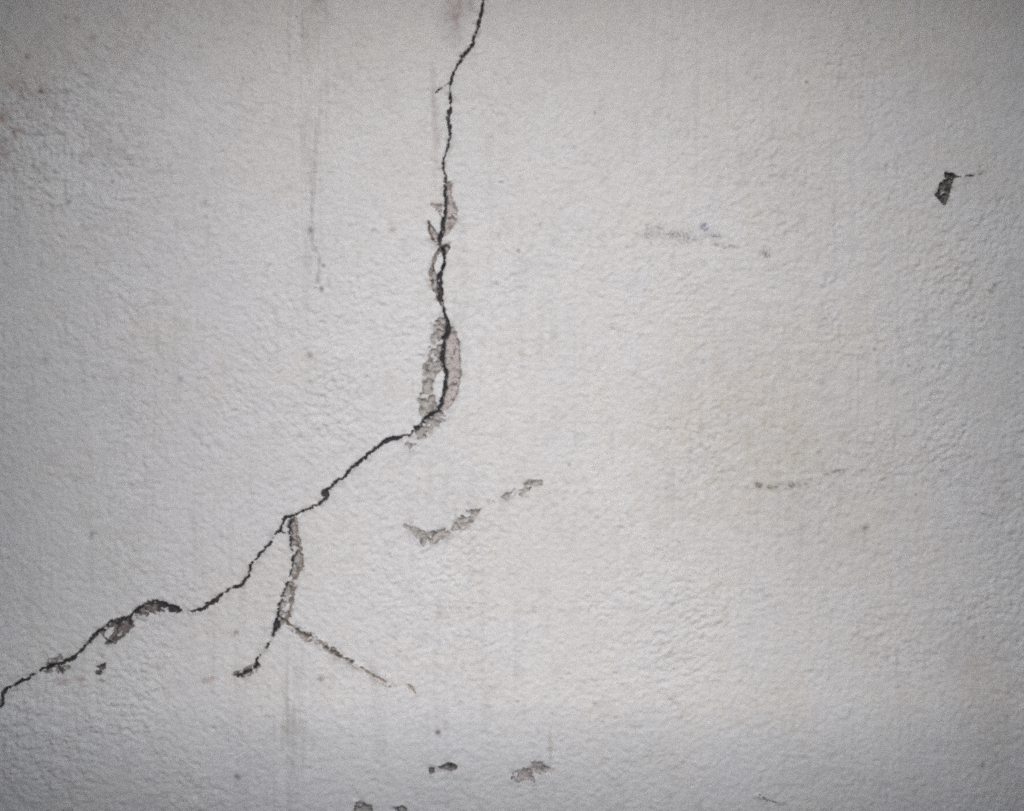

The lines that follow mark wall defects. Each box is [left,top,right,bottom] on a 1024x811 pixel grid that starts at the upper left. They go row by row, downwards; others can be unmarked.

crack [0,0,484,708]
peeling [405,181,462,452]
hole [935,172,981,205]
peeling [404,480,543,547]